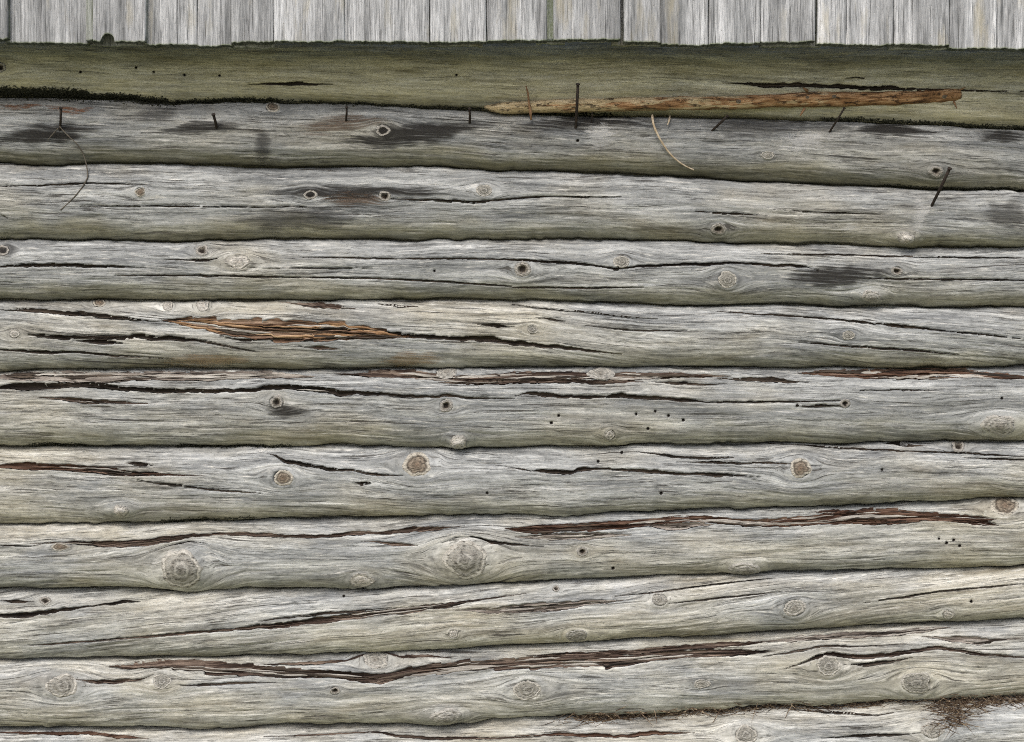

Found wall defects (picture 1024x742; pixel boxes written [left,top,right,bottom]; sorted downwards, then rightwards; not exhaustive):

damp [314,115,494,148]
crack [0,253,1024,360]
crack [0,376,936,407]
crack [76,674,154,684]
crack [178,652,450,686]